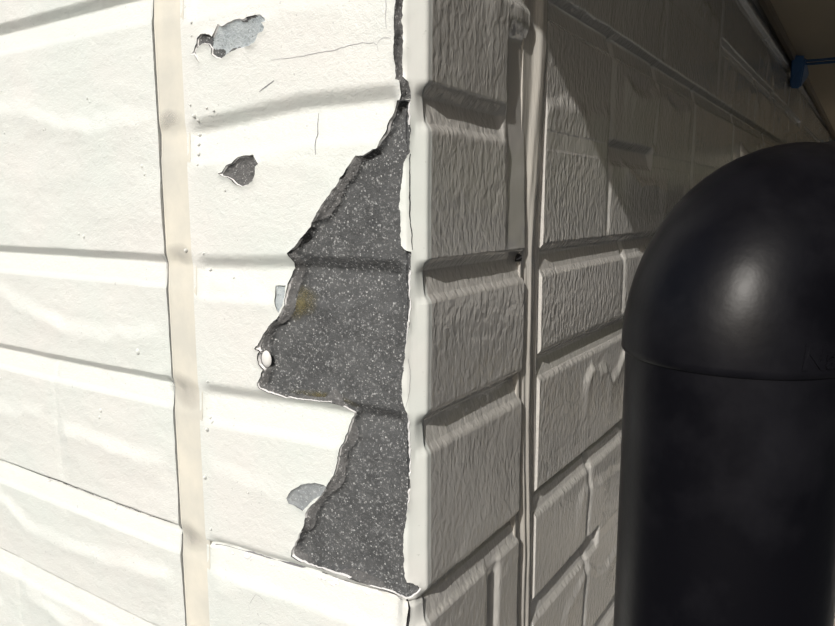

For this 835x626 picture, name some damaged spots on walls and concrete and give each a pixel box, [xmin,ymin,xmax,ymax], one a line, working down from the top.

spalling [191,14,265,61]
crack [273,0,411,100]
spalling [219,155,258,187]
spalling [255,99,421,598]
crack [215,544,410,626]